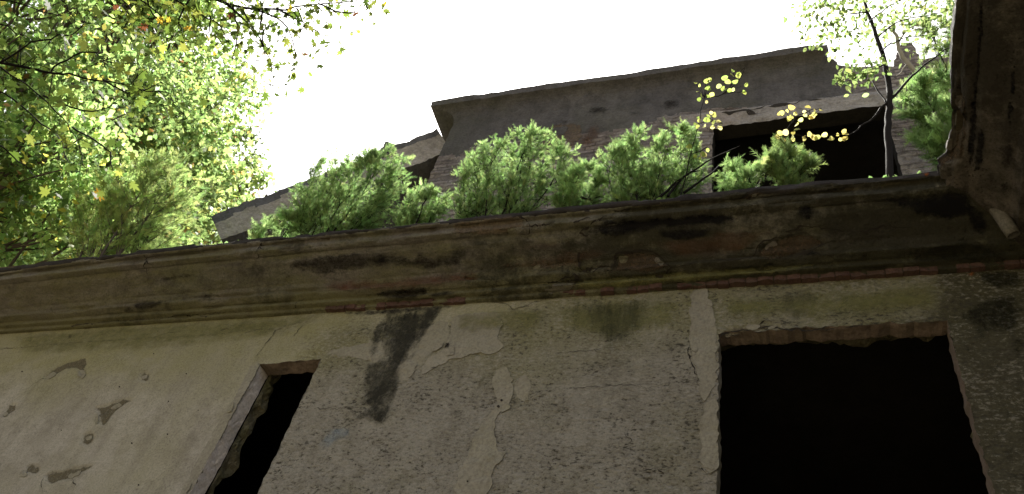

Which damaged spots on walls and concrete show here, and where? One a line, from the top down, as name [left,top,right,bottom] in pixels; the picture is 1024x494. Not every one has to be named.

leakage [293,255,459,272]
flaking render [600,283,662,296]
spalling [21,359,86,395]
leakage [349,288,451,422]
peeling [325,297,504,381]
peeling [677,266,938,474]
spalling [84,386,129,444]
peeling [453,367,531,494]
spalling [19,465,90,489]